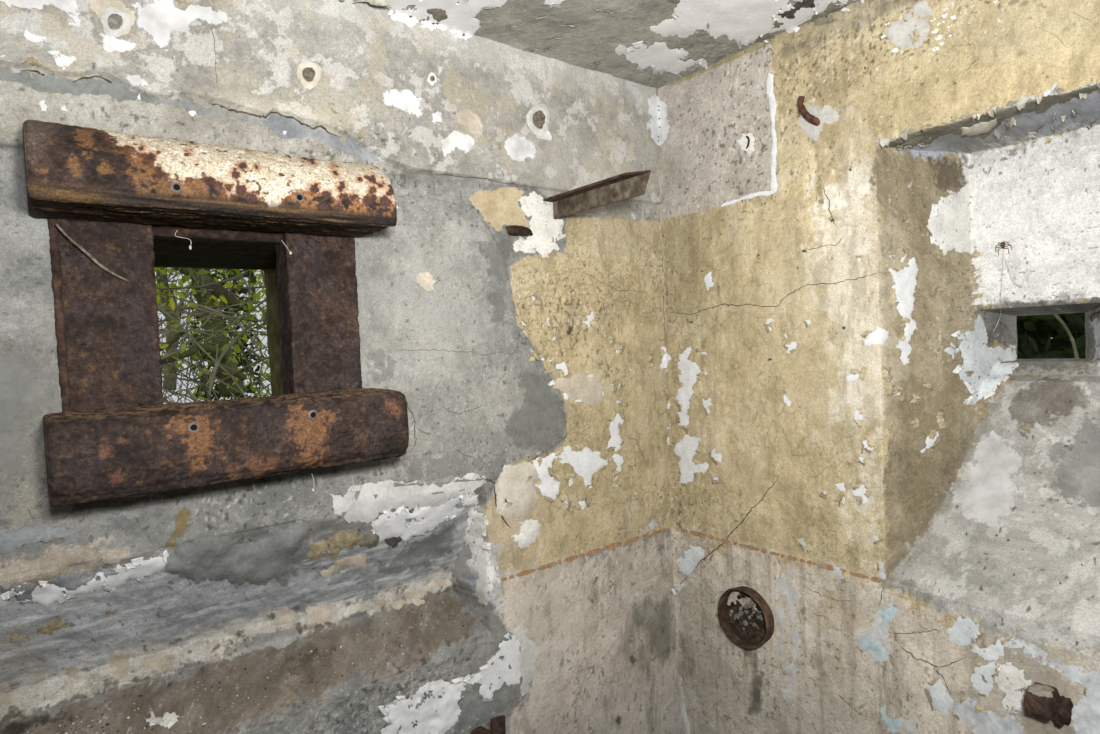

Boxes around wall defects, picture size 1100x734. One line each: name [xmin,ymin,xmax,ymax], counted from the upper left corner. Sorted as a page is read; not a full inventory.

peeling [340,0,507,40]
peeling [615,0,864,78]
flaking render [469,187,567,258]
peeling [927,172,981,256]
crack [585,273,877,315]
peeling [944,314,1019,405]
peeling [529,333,636,512]
peeling [647,345,727,487]
flaking render [329,473,500,610]
crack [680,475,780,584]
peeling [378,625,539,734]
rust [1051,694,1073,728]